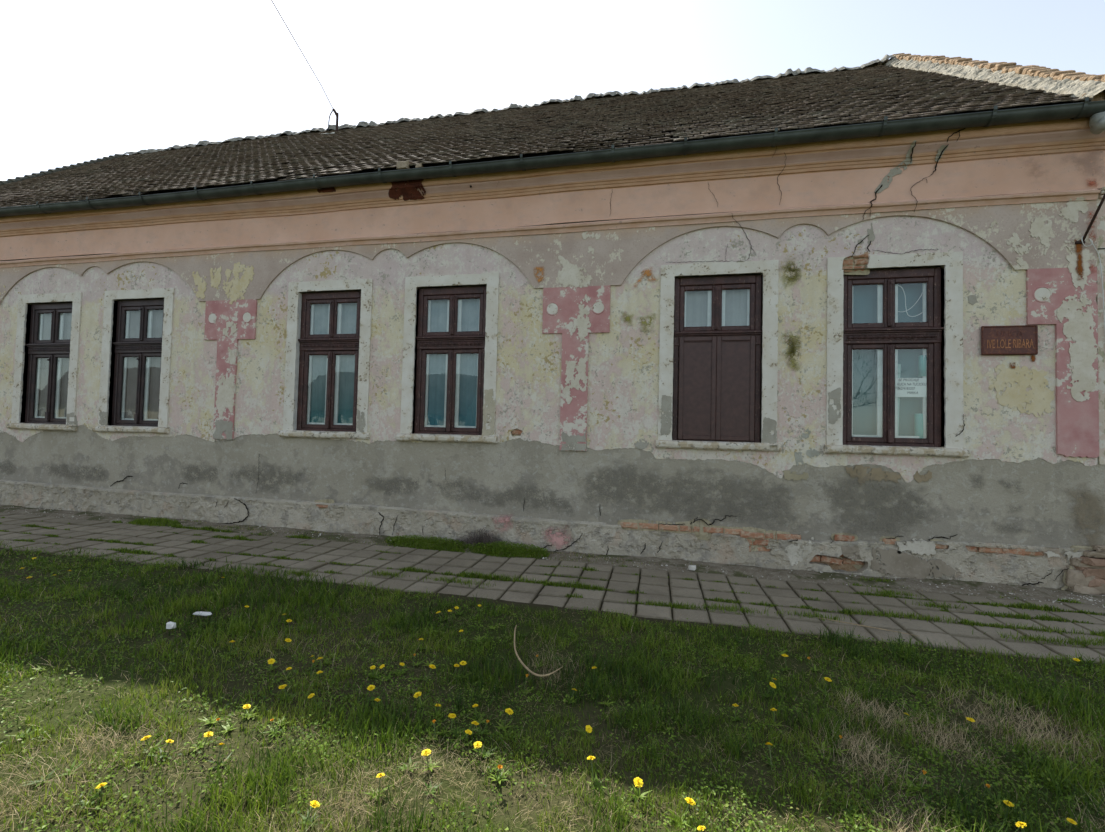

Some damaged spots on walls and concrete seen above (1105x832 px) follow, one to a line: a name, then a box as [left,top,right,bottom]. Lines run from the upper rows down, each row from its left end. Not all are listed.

crack [851,128,965,257]
peeling [1007,196,1088,266]
corrosion [1074,213,1096,280]
peeling [192,262,255,304]
peeling [558,231,601,342]
peeling [988,238,1098,418]
peeling [213,318,238,442]
peeling [563,354,588,404]
flaking render [846,464,901,485]
flaking render [617,518,814,552]
flaking render [810,554,864,570]
spalling [965,545,1105,595]